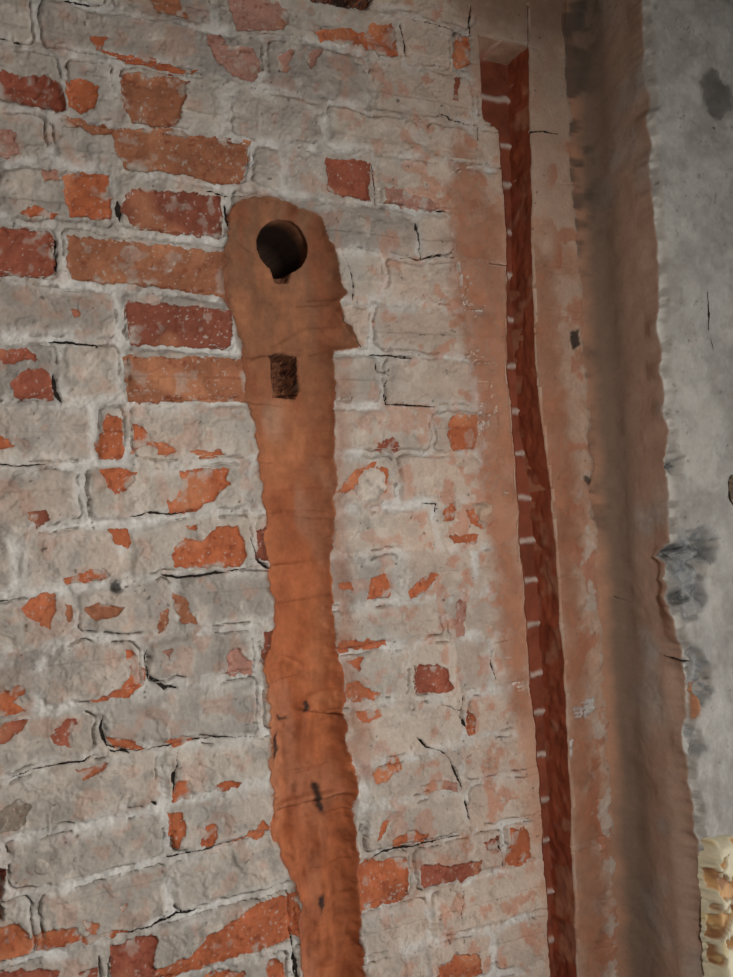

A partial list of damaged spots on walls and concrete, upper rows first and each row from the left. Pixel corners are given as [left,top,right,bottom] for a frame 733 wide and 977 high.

flaking render [325,157,371,202]
flaking render [0,36,251,405]
spalling [94,414,176,494]
spalling [167,449,268,569]
spalling [22,592,125,629]
spalling [336,638,386,723]
spalling [413,663,455,694]
spalling [167,780,193,849]
crack [417,738,470,819]
flaking render [357,812,531,910]
flaking render [0,868,301,977]
spalling [437,952,483,977]